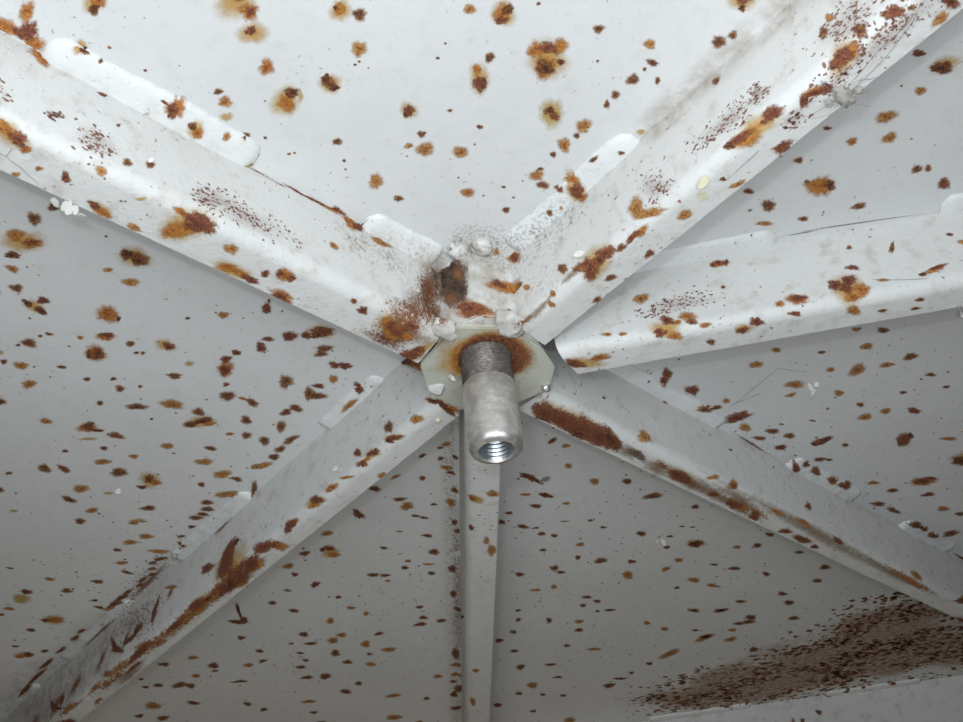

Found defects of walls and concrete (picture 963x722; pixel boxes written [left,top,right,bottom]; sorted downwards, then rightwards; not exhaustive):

corrosion [0,2,49,66]
corrosion [527,39,567,79]
corrosion [829,24,866,72]
corrosion [0,119,31,153]
corrosion [723,105,786,150]
corrosion [4,204,59,319]
corrosion [162,207,217,238]
corrosion [363,256,494,372]
corrosion [558,197,664,282]
corrosion [828,265,888,315]
corrosion [50,326,352,722]
corrosion [532,396,963,719]